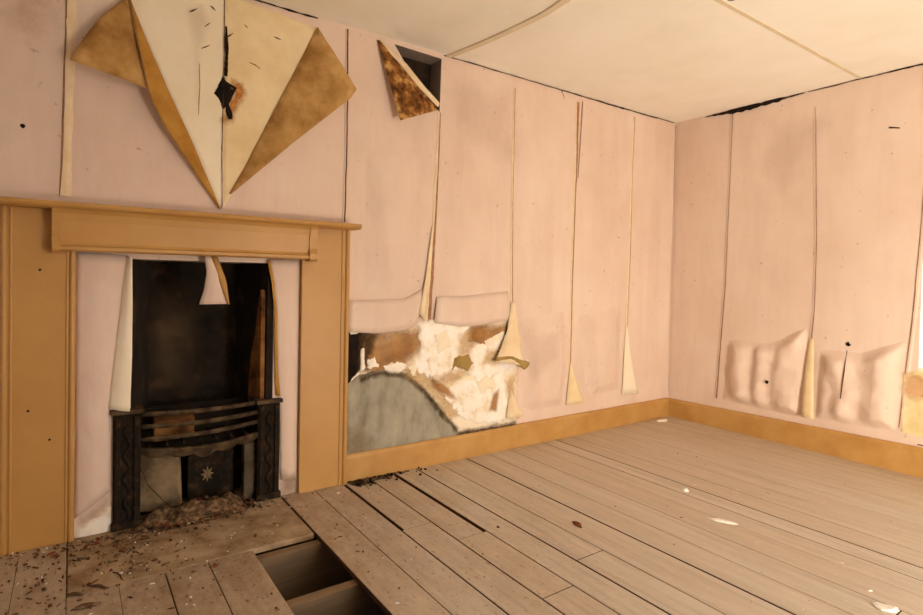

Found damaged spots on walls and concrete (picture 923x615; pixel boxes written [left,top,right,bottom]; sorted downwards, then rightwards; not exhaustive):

flaking render [129,0,244,209]
spalling [395,44,442,112]
spalling [347,319,517,454]